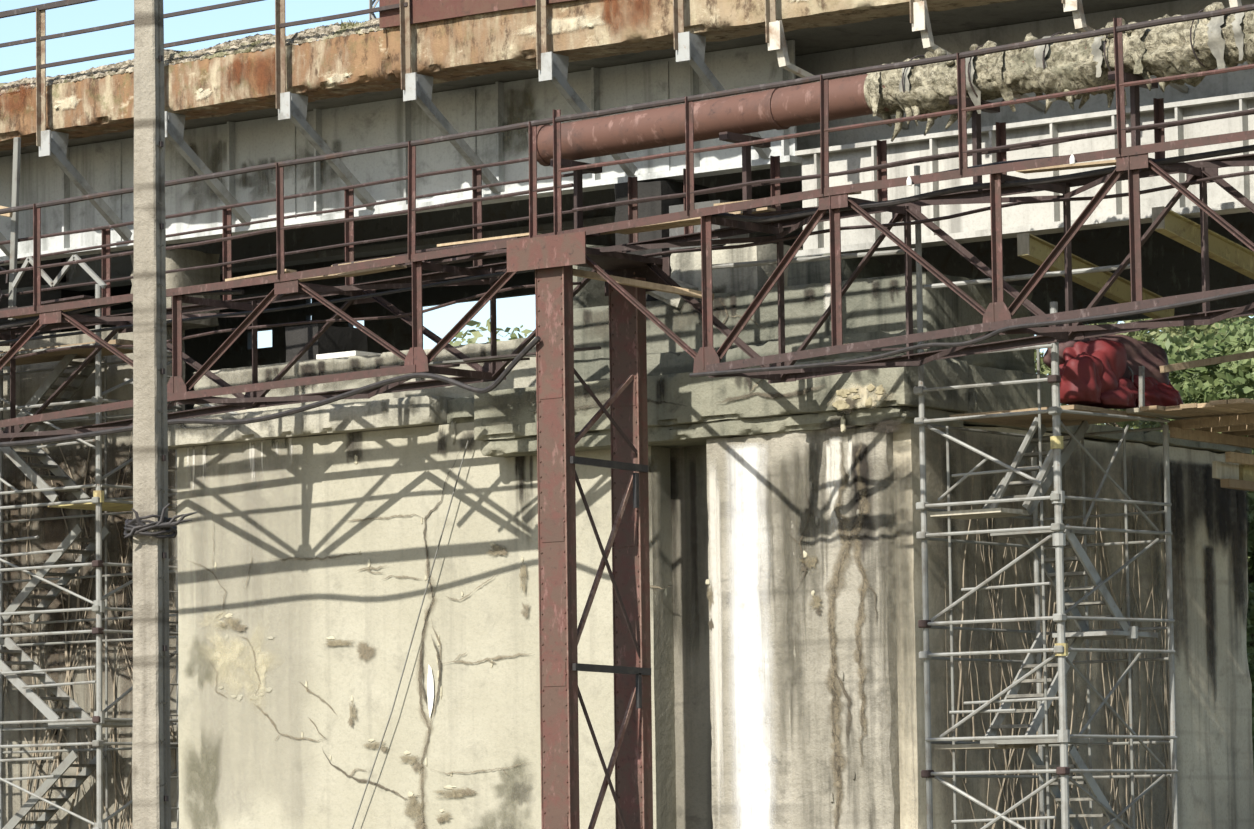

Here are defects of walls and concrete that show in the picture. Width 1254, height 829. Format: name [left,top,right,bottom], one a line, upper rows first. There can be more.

corrosion [233,60,272,92]
spalling [821,384,888,433]
peeling [208,613,274,702]
crack [193,463,528,829]
water stain [670,438,913,829]
water stain [933,436,1249,829]
crack [159,695,167,829]
water stain [479,759,527,829]